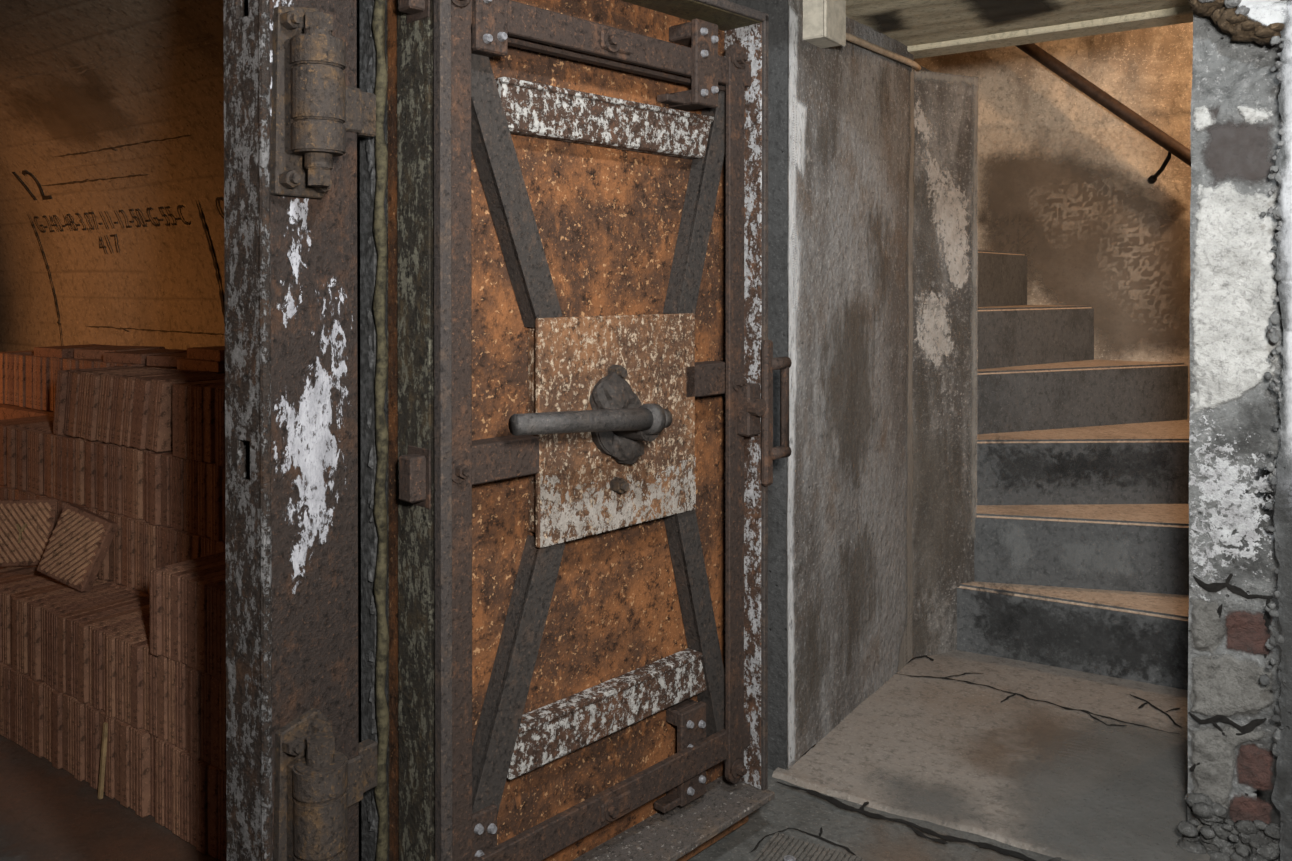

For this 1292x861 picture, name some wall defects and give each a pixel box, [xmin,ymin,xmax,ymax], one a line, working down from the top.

spalling [1188,0,1288,83]
peeling [273,196,353,594]
flaking render [1189,106,1288,831]
crack [896,655,1267,736]